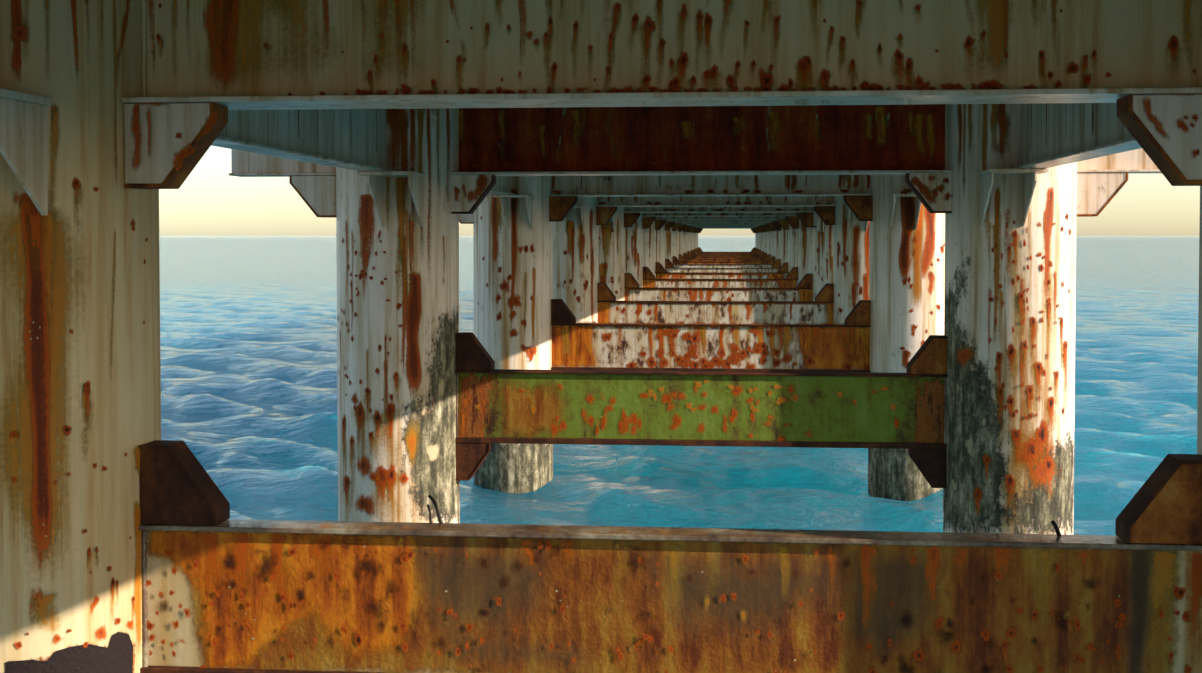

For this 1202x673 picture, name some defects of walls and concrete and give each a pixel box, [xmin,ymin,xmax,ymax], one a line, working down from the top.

corrosion [0,106,90,569]
corrosion [131,102,164,168]
corrosion [149,0,344,87]
corrosion [340,108,537,521]
damp [400,304,553,523]
corrosion [458,373,567,438]
corrosion [336,0,1012,369]
corrosion [551,164,870,441]
damp [868,257,1074,535]
corrosion [986,188,1071,530]
corrosion [1143,99,1198,137]
corrosion [5,502,1202,673]